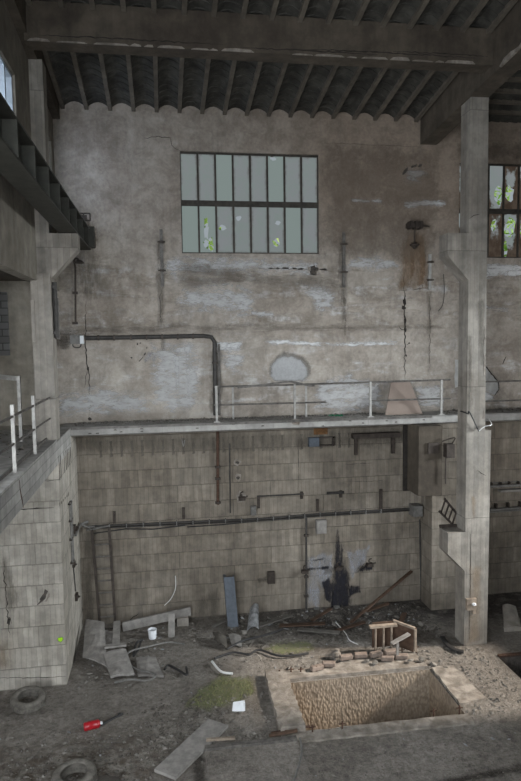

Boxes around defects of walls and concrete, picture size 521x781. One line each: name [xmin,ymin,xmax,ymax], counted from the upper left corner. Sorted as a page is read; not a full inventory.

crack [84,304,92,420]
crack [400,274,431,374]
crack [3,564,11,633]
damp [322,578,333,605]